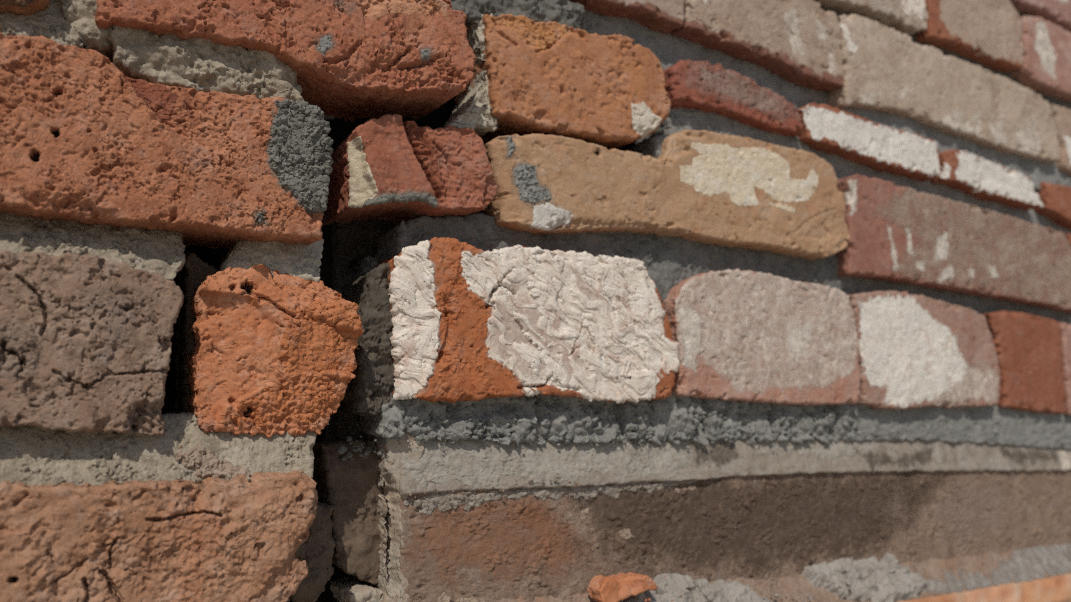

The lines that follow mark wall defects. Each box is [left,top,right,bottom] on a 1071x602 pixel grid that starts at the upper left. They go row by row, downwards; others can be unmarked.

peeling [799,105,1043,208]
crack [18,277,49,341]
crack [54,371,159,394]
peeling [388,238,680,404]
peeling [858,292,967,409]
crack [84,539,121,602]